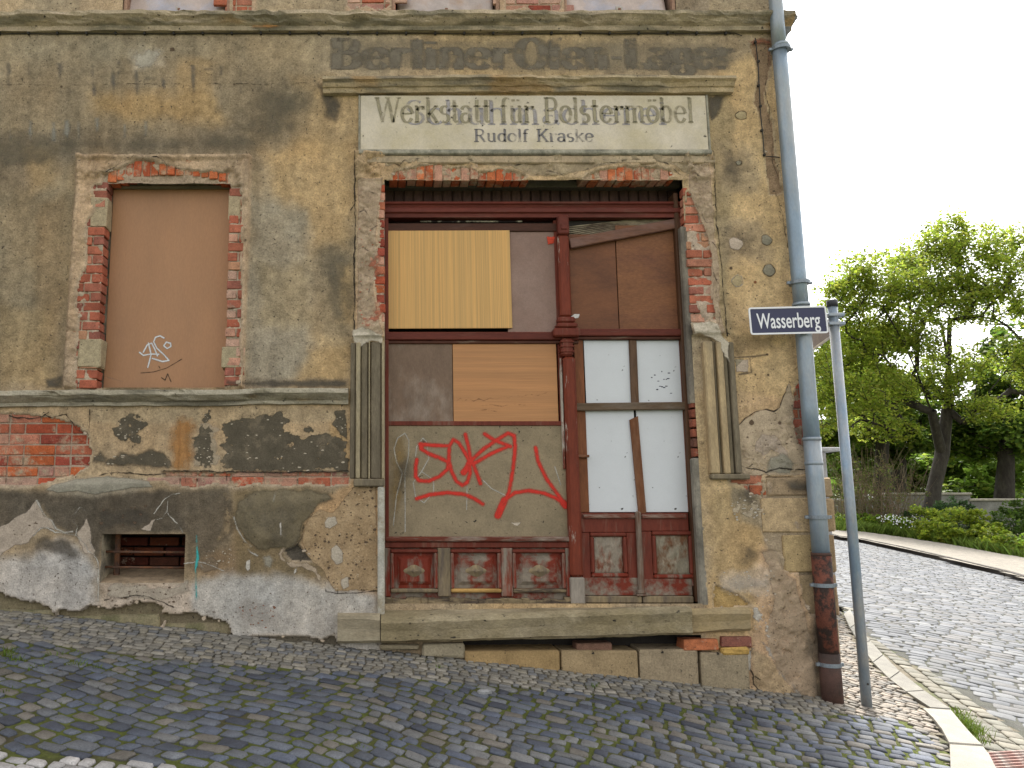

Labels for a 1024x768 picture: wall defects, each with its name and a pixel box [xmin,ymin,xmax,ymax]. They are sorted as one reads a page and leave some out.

flaking render [73,160,245,390]
flaking render [353,153,729,358]
flaking render [0,413,92,487]
peeling [112,414,148,444]
flaking render [0,500,95,556]
spalling [148,410,378,592]
spalling [0,581,232,634]
spalling [239,593,338,645]